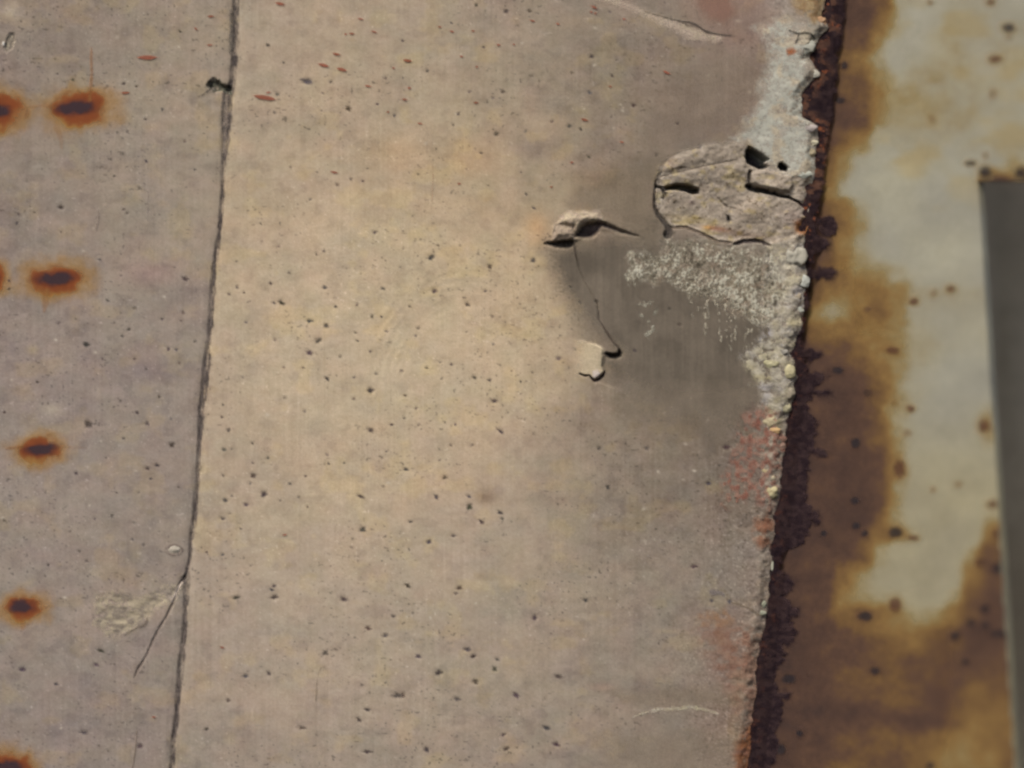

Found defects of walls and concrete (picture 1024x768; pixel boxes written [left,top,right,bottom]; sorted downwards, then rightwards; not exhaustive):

corrosion [0,91,30,135]
corrosion [49,89,108,129]
corrosion [965,158,1024,181]
spalling [629,0,828,505]
corrosion [27,264,88,298]
crack [598,310,621,353]
leakage [554,238,805,431]
peeling [580,344,622,382]
corrosion [770,0,1014,768]
corrosion [17,433,63,467]
corrosion [2,594,44,624]
crack [135,576,186,676]